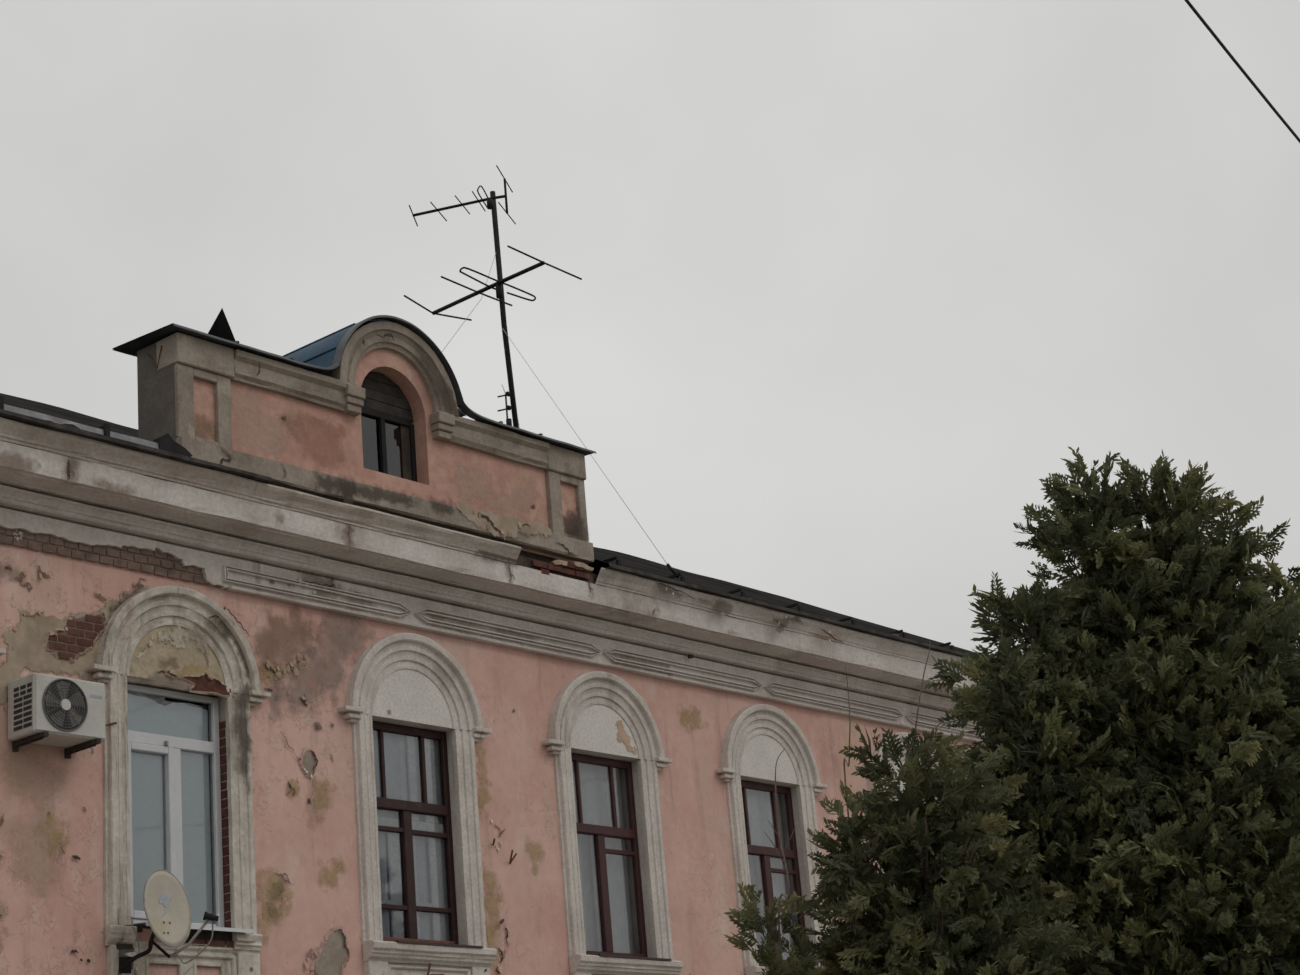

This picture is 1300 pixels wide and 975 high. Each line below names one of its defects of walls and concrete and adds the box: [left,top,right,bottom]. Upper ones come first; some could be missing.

spalling [456,501,598,585]
peeling [0,527,234,710]
spalling [280,732,318,779]
spalling [304,926,350,975]